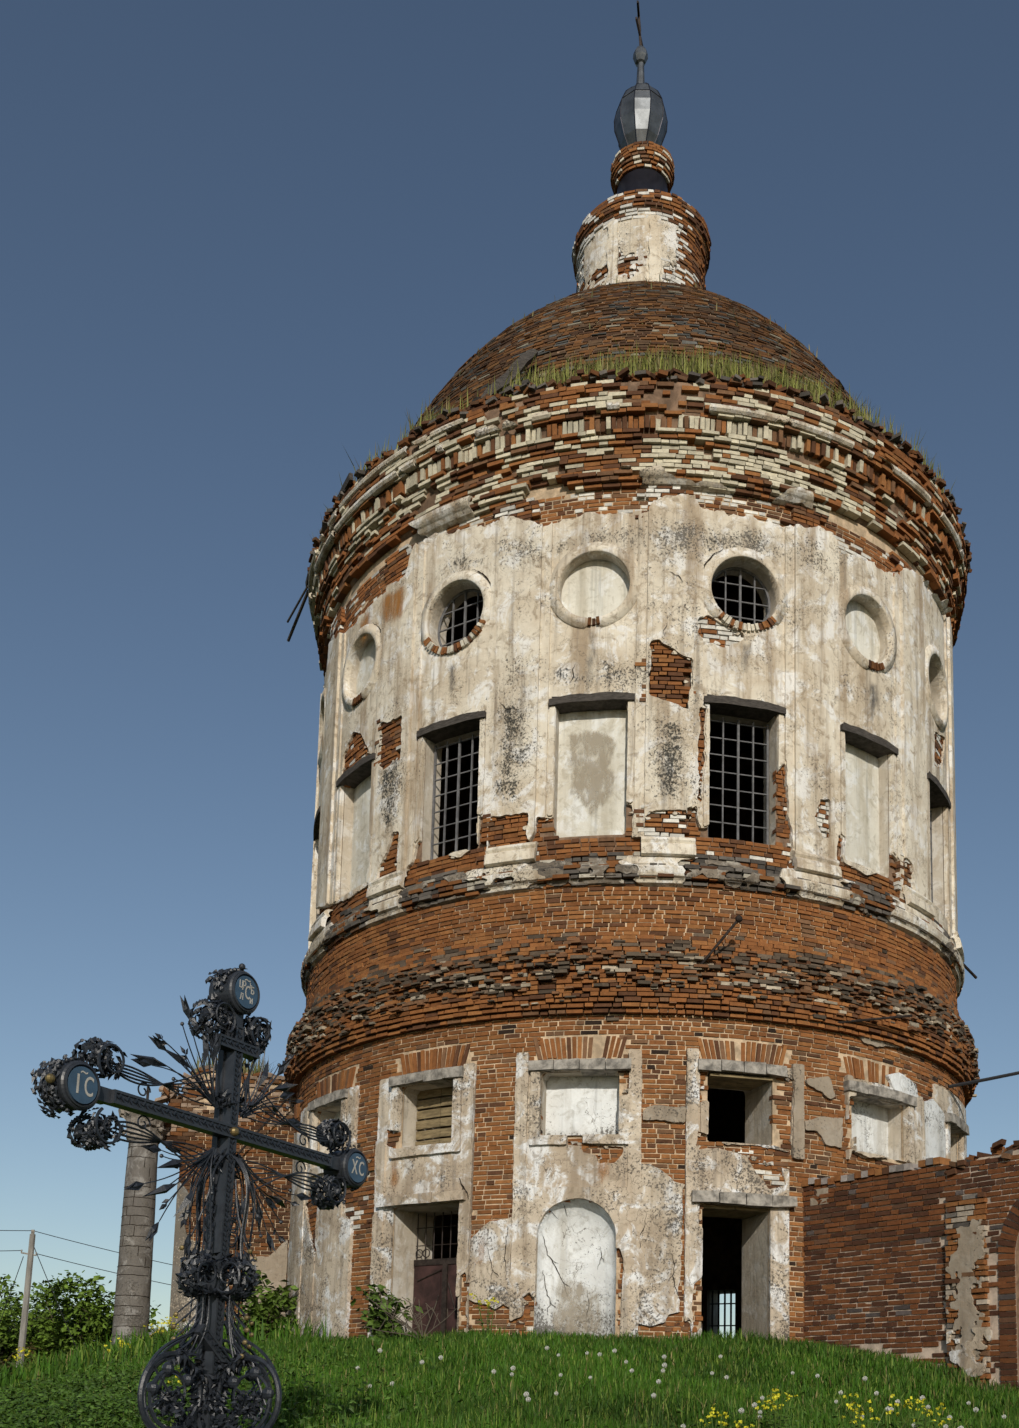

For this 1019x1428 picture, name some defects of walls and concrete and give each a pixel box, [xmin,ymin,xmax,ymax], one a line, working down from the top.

mould [489,690,531,809]
spalling [319,641,792,923]
mould [652,719,688,797]
spalling [815,799,913,899]
peeling [643,1072,708,1123]
peeling [682,1076,899,1206]
peeling [169,1182,204,1337]
peeling [242,1132,317,1337]
peeling [458,1217,537,1336]
peeling [945,1219,993,1377]